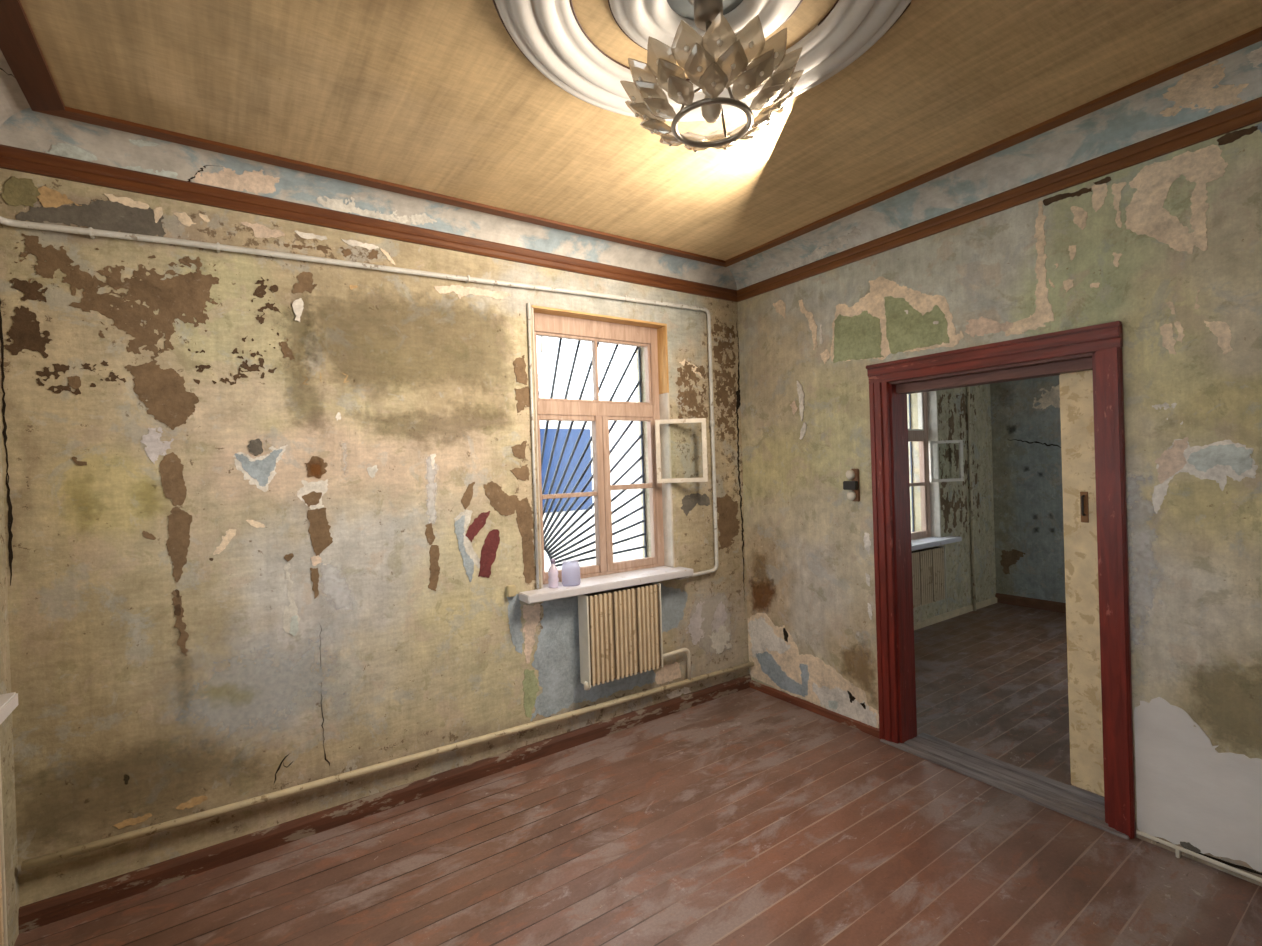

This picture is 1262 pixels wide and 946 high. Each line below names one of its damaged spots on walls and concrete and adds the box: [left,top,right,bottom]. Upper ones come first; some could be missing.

peeling [241,222,395,265]
peeling [769,123,1262,364]
peeling [1,176,295,430]
peeling [249,271,317,324]
peeling [513,355,530,413]
peeling [676,323,737,440]
peeling [510,441,530,481]
peeling [142,452,192,656]
peeling [454,481,536,584]
spalling [681,493,740,550]
spalling [747,613,879,728]